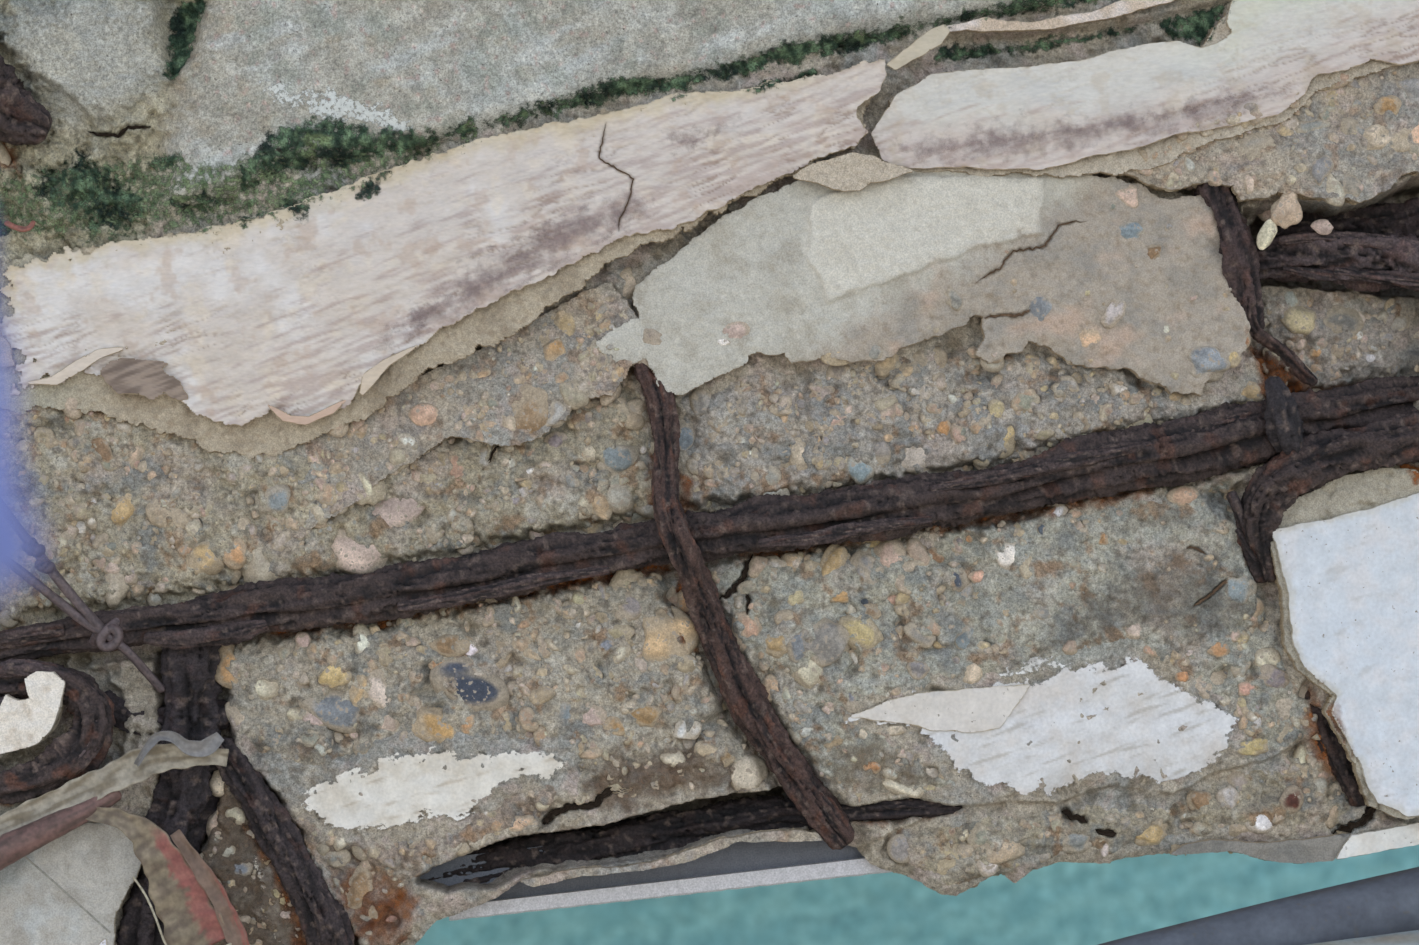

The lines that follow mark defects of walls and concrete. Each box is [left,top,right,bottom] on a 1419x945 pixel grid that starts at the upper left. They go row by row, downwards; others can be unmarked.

peeling [871,0,1419,207]
crack [599,124,634,231]
peeling [0,55,913,427]
corrosion [1251,345,1323,397]
corrosion [466,572,616,607]
peeling [0,168,1419,822]
corrosion [740,544,825,557]
corrosion [929,490,1152,534]
peeling [0,822,142,945]
corrosion [344,875,414,944]
peeling [291,745,822,945]
crack [542,787,625,825]